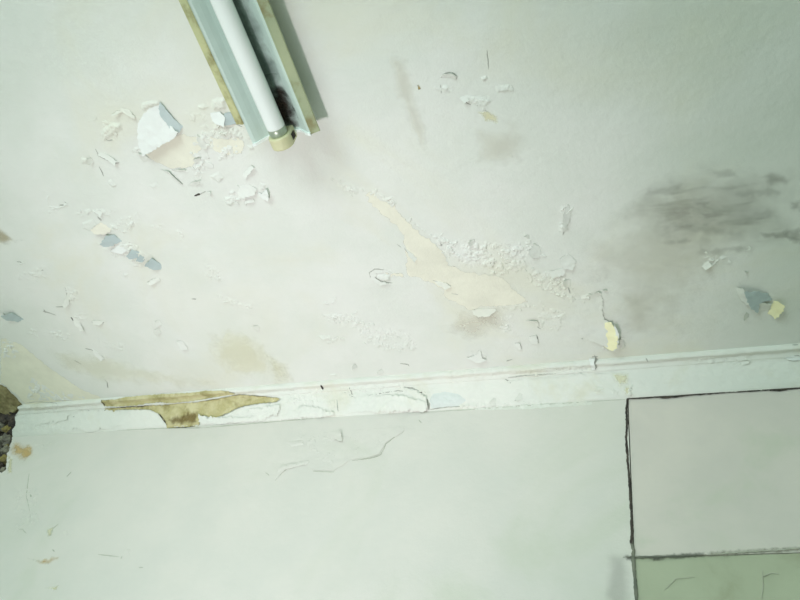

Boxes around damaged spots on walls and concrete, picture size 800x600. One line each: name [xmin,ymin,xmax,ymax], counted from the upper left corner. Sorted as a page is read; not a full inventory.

peeling [131,96,269,207]
peeling [81,210,162,285]
peeling [566,290,627,351]
peeling [736,287,785,321]
spalling [0,385,22,473]
peeling [101,382,466,428]
crack [426,356,800,600]